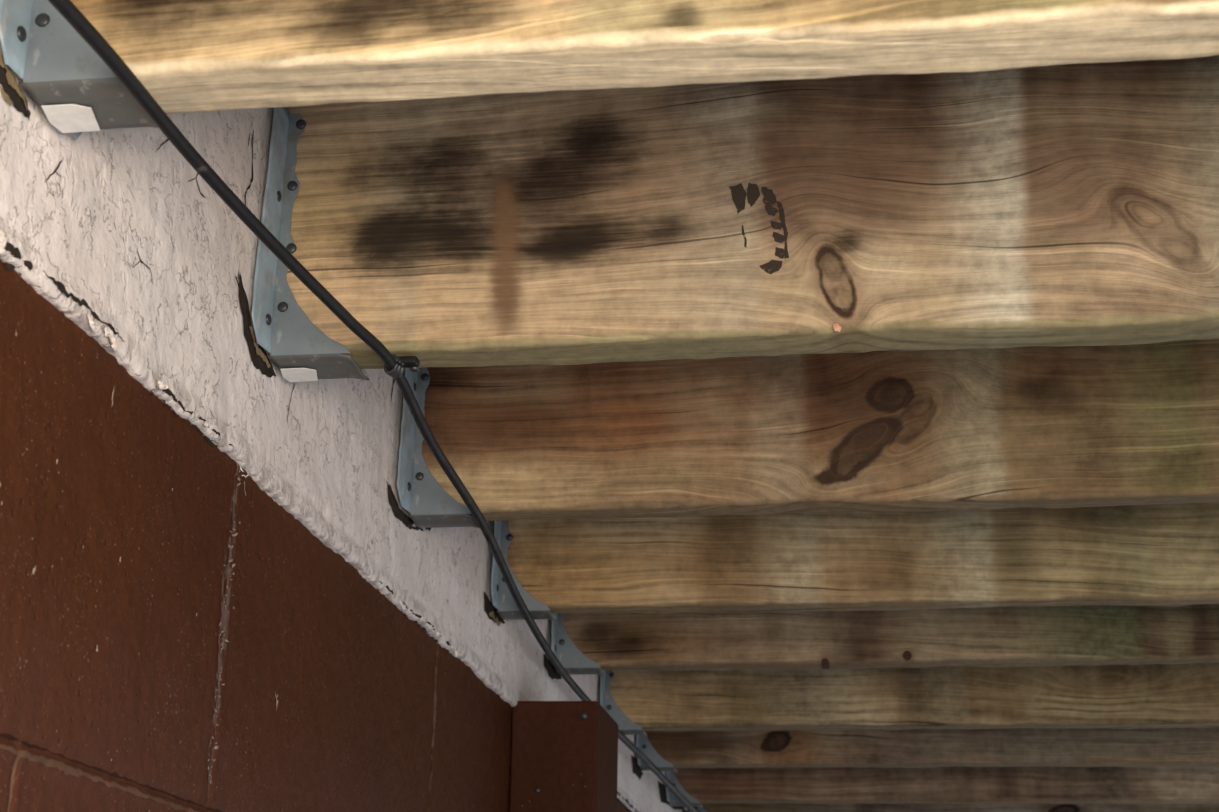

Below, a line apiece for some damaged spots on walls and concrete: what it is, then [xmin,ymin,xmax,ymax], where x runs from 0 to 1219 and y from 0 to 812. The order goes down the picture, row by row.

water stain [118,0,236,22]
water stain [319,0,492,40]
spalling [0,53,31,120]
water stain [355,121,683,321]
spalling [0,229,125,351]
spalling [238,274,276,378]